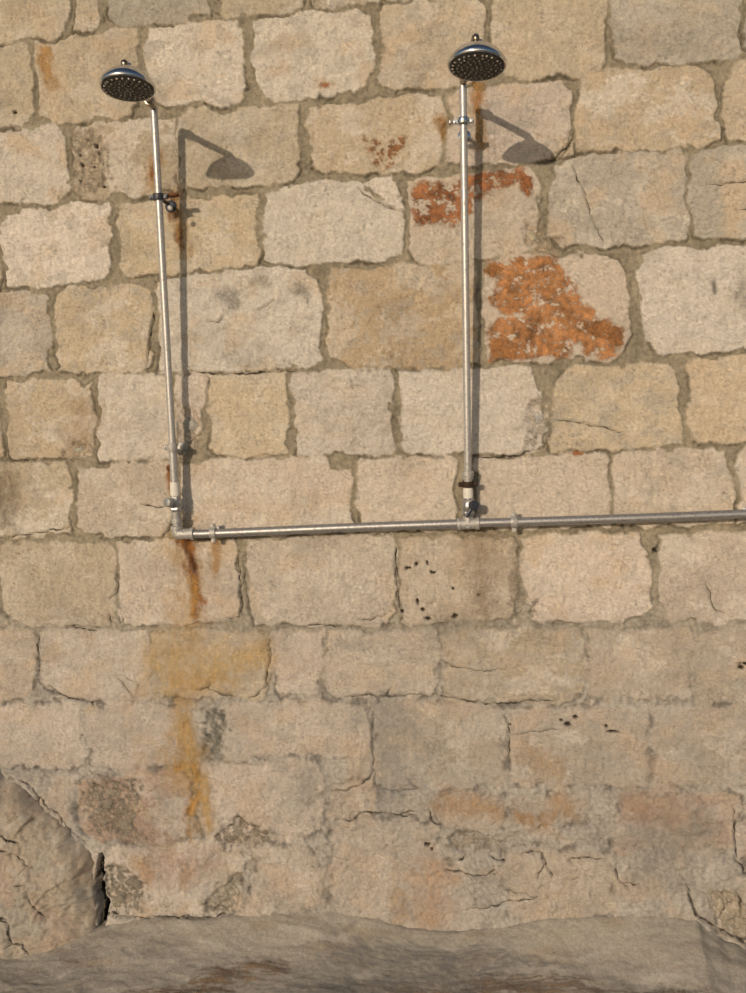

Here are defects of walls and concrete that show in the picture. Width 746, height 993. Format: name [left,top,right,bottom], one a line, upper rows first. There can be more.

rust [177,539,206,616]
crack [337,690,555,825]
crack [0,836,47,922]
crack [448,850,637,909]
crack [688,810,745,943]
crack [0,917,28,952]